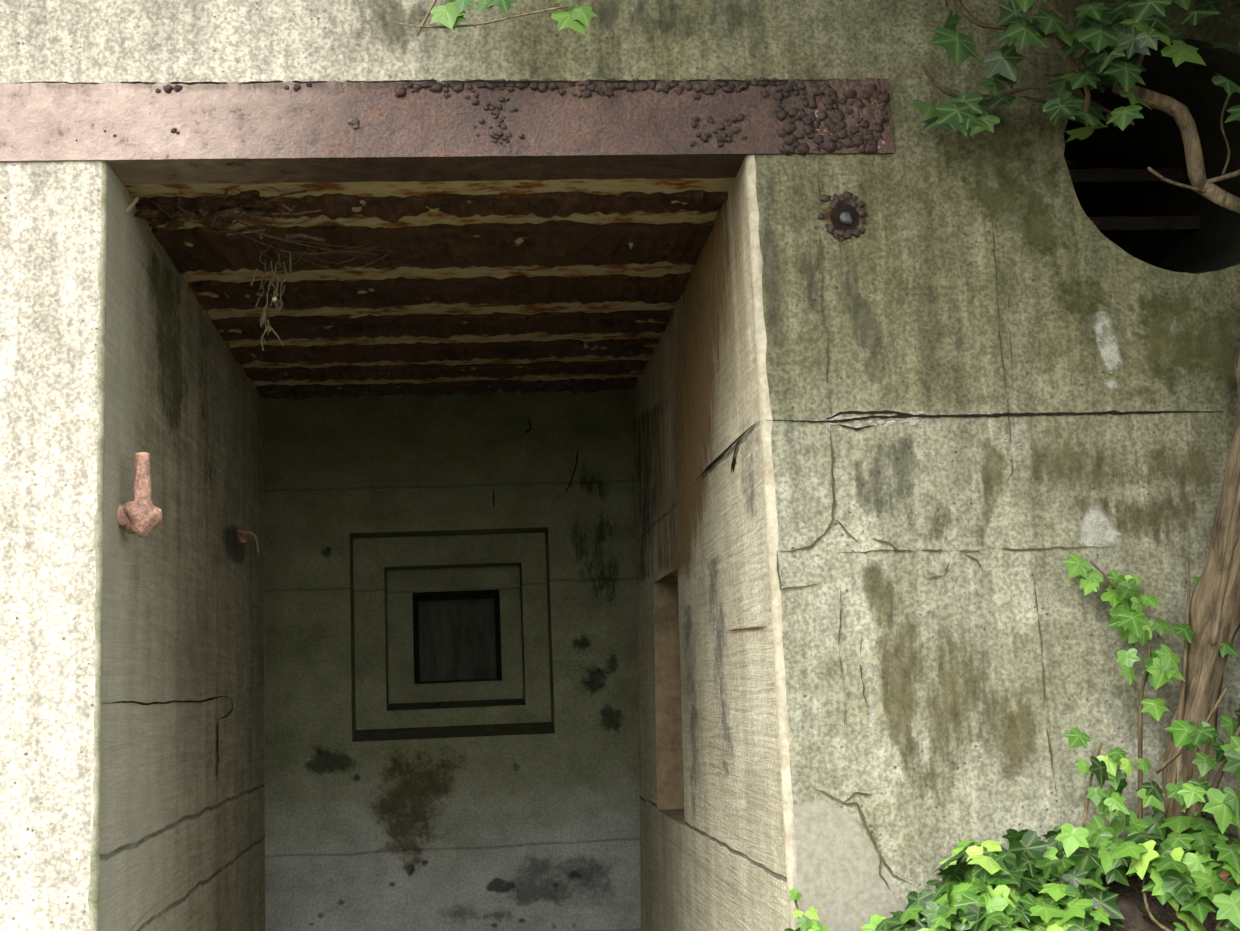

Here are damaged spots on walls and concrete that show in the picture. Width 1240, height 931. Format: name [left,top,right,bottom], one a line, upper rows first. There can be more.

water stain [763,230,779,343]
water stain [846,272,882,373]
water stain [855,438,916,515]
crack [696,160,1223,793]
crack [103,696,233,782]
water stain [307,747,353,775]
water stain [864,564,922,774]
water stain [925,637,1032,787]
crack [812,787,913,891]